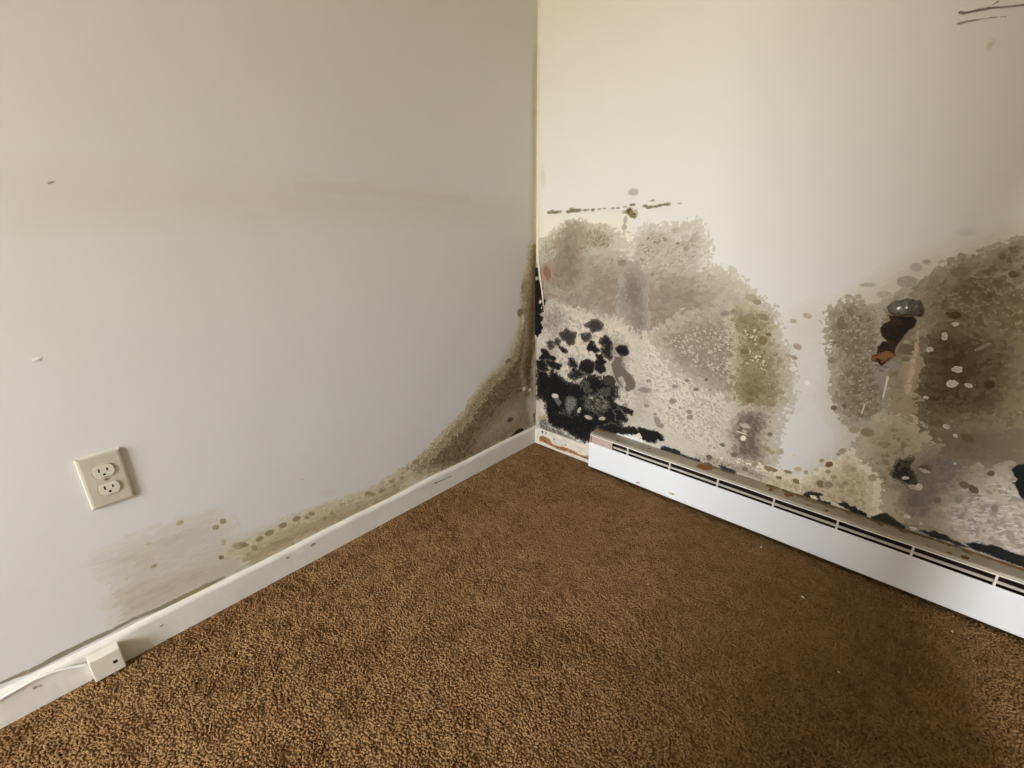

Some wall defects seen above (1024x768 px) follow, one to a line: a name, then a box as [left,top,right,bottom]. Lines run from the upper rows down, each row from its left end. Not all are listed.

mould [79,45,1024,635]
corrosion [871,314,917,366]